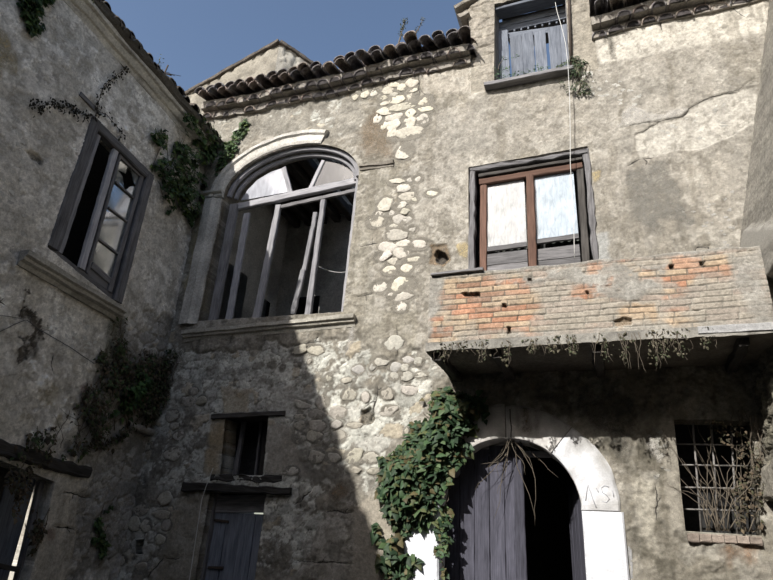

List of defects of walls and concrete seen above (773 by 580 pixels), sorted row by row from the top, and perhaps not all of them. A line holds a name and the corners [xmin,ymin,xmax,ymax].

flaking render [350,76,436,162]
crack [622,79,753,134]
flaking render [365,173,450,314]
flaking render [290,335,429,476]